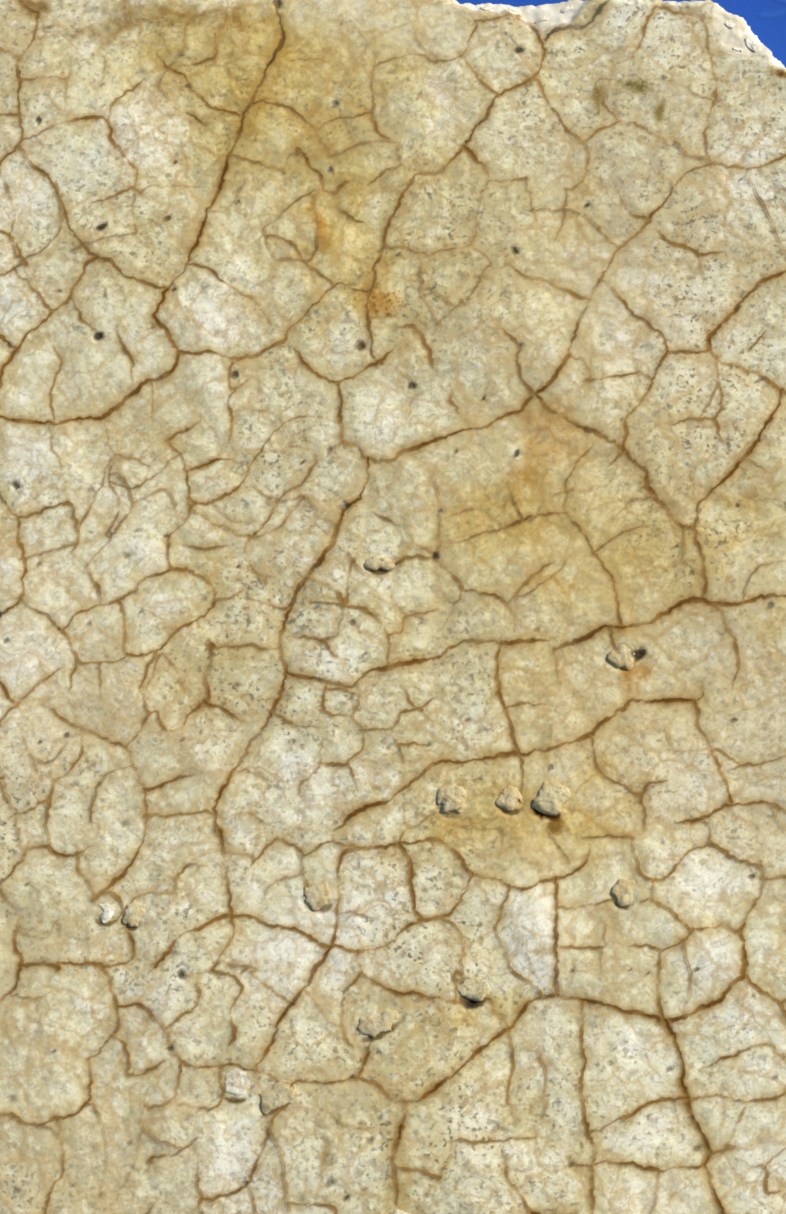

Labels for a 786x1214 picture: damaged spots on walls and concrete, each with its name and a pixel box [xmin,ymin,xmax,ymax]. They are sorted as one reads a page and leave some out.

crack [0,259,177,423]
crack [711,272,786,391]
crack [216,827,225,852]
crack [248,837,334,871]
crack [187,873,326,948]
crack [229,1017,237,1045]
crack [421,994,557,1107]
crack [622,1018,694,1119]
crack [667,930,786,1214]
crack [196,1155,261,1208]
crack [391,1124,404,1201]
crack [396,1165,443,1180]